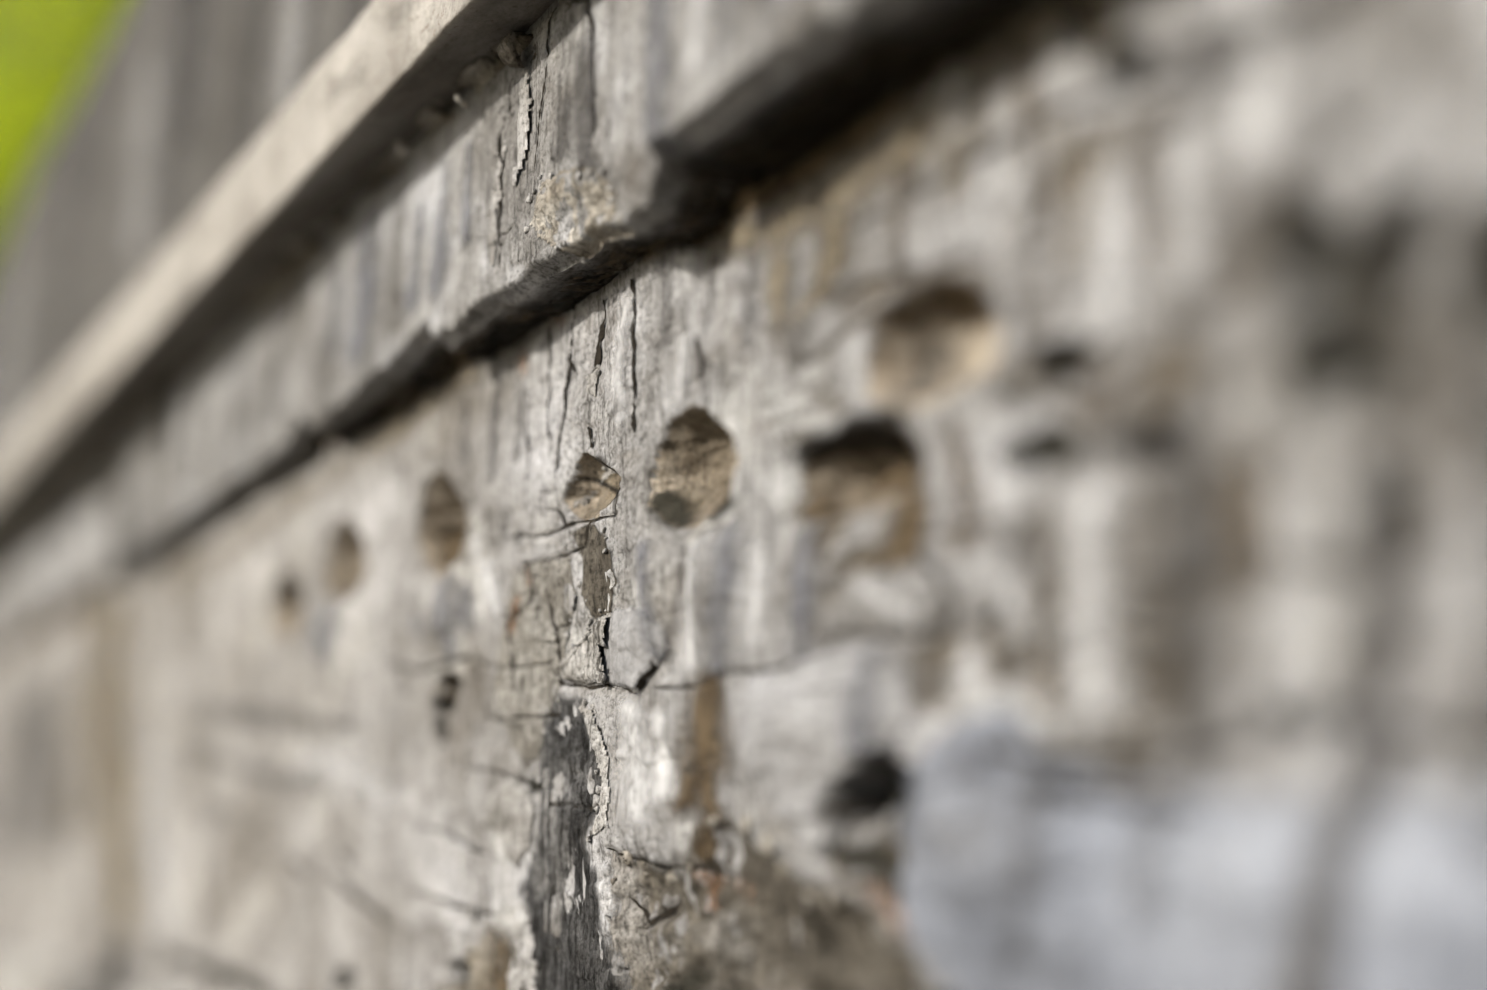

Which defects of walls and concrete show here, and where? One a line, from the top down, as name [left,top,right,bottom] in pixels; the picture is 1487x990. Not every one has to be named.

crack [494,0,595,275]
crack [385,279,842,721]
peeling [686,515,731,549]
crack [465,767,593,811]
crack [607,848,754,929]
spalling [438,524,932,990]